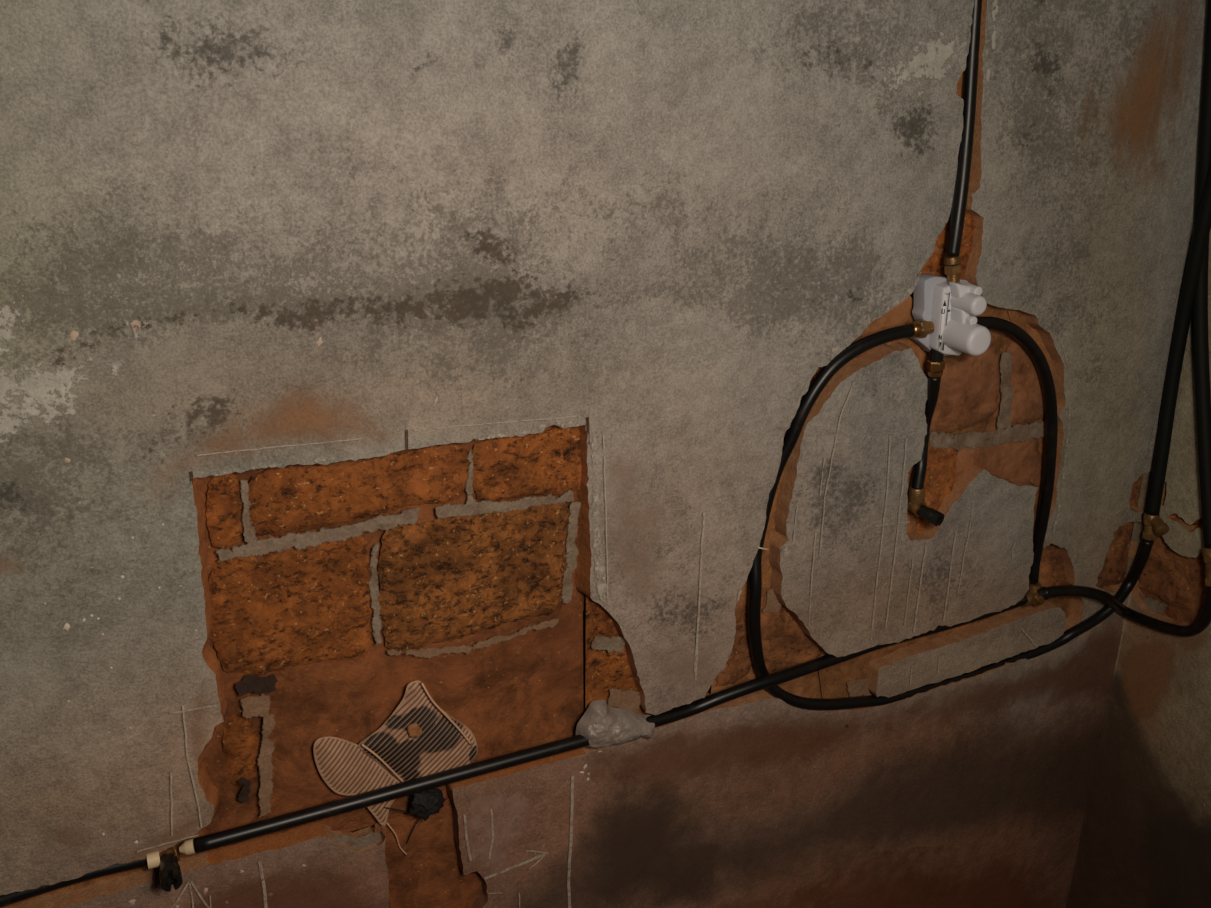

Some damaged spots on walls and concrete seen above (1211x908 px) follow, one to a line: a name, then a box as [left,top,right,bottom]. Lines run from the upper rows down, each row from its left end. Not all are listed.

damp [0,301,197,450]
damp [230,230,631,338]
flaking render [768,0,1084,711]
flaking render [1096,474,1206,626]
flaking render [178,420,779,875]
damp [137,705,217,852]
damp [957,636,1211,908]
spalling [6,867,160,908]
damp [484,850,547,894]